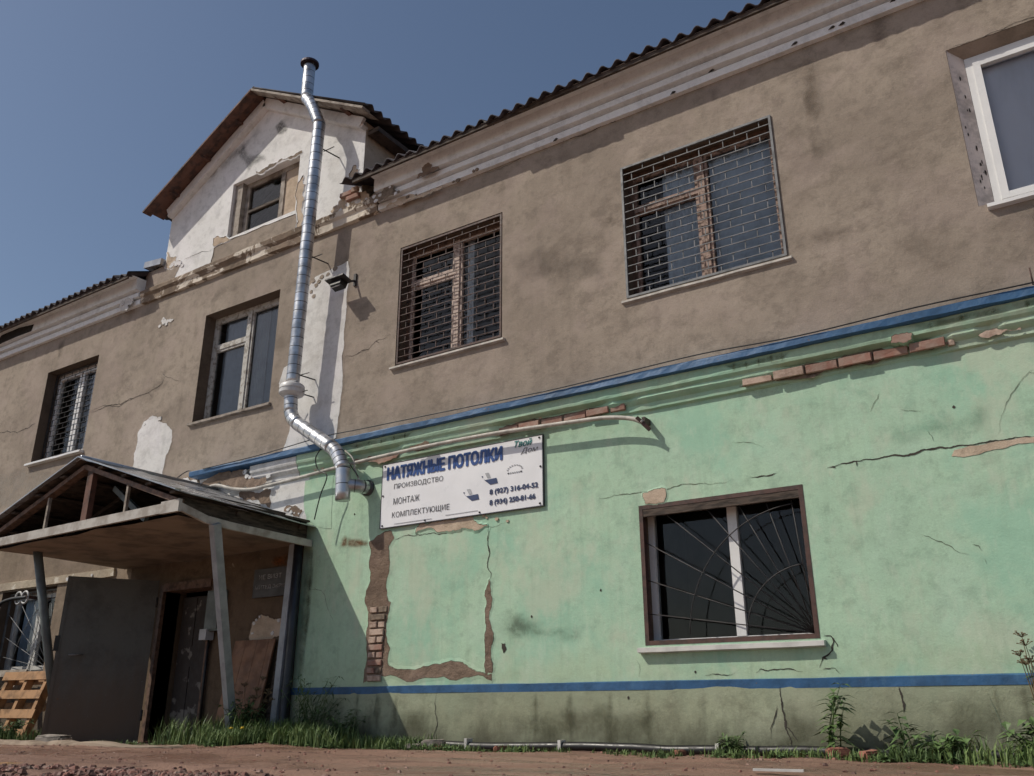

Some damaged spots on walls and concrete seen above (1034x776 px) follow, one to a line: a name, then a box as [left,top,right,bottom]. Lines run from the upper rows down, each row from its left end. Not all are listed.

flaking render [211,175,306,262]
flaking render [979,328,1021,338]
flaking render [742,332,956,387]
crack [94,374,178,412]
flaking render [132,414,174,474]
flaking render [494,403,626,436]
crack [828,371,1034,468]
flaking render [183,469,304,518]
flaking render [641,485,669,505]
flaking render [362,515,509,686]
flaking render [248,613,281,640]